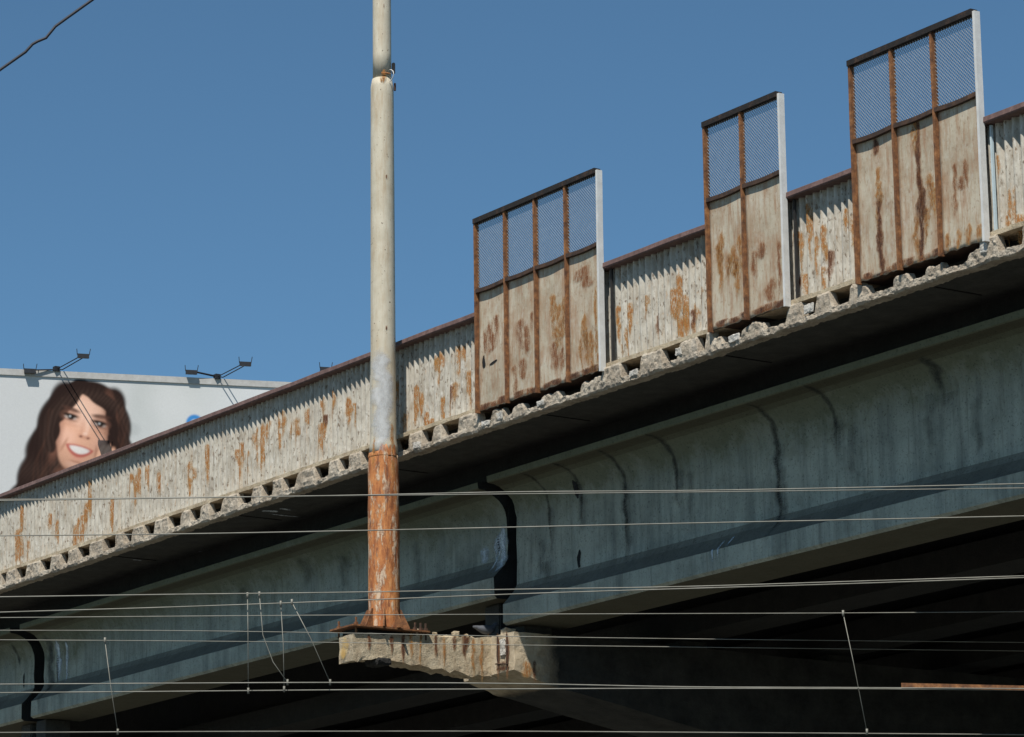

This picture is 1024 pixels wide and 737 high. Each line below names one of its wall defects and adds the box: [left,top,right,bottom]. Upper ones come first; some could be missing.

corrosion [864,122,982,279]
corrosion [616,296,659,367]
corrosion [670,276,703,337]
corrosion [715,235,783,327]
corrosion [797,204,843,304]
corrosion [368,266,598,469]
corrosion [15,506,30,563]
corrosion [73,479,92,545]
corrosion [129,465,161,505]
corrosion [184,444,214,497]
corrosion [235,391,356,484]
spalling [495,633,509,669]